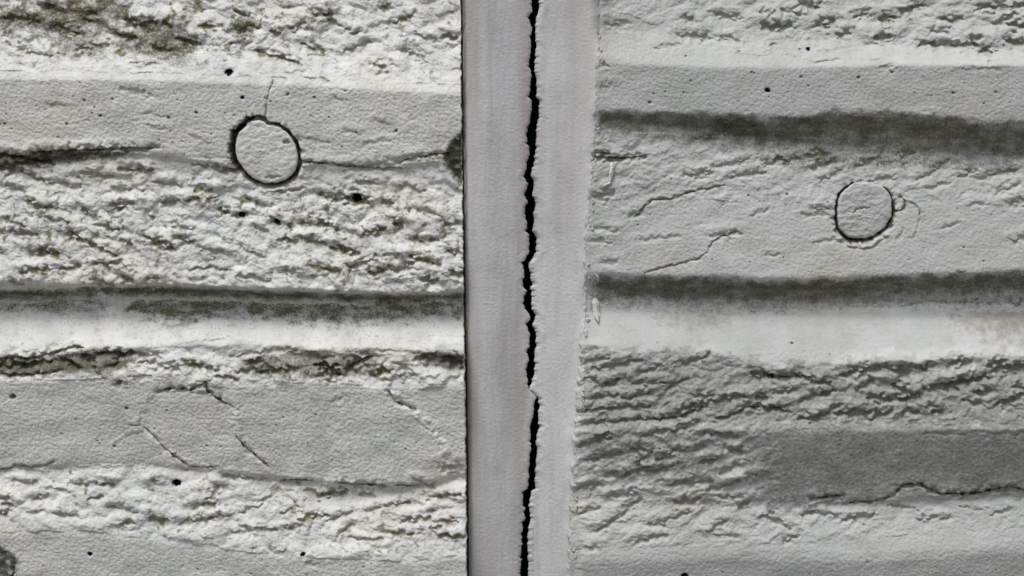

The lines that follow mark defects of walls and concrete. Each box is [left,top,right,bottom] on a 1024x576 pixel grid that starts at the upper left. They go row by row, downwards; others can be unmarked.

leakage [600,109,1024,172]
crack [636,185,722,216]
leakage [0,287,463,325]
crack [228,0,469,576]
crack [520,0,540,576]
leakage [595,271,1024,310]
crack [164,384,228,404]
crack [815,483,1018,503]